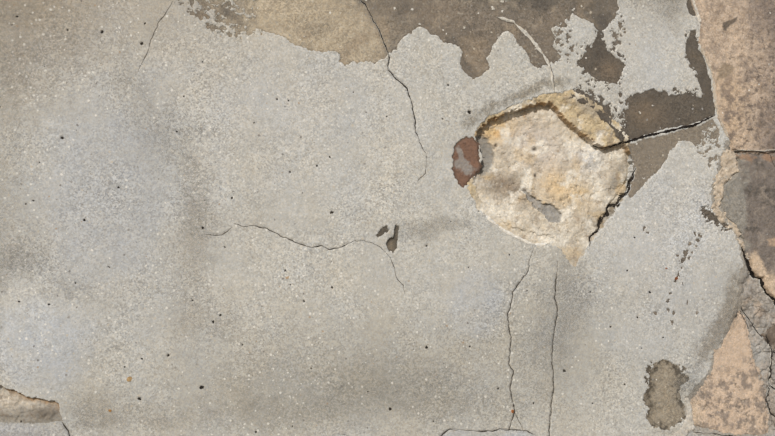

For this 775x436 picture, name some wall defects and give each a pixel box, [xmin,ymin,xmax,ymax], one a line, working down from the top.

crack [360,0,427,179]
crack [593,114,716,149]
crack [207,223,405,292]
spalling [178,0,775,436]
crack [589,168,636,247]
crack [441,251,558,436]
spalling [0,385,63,424]